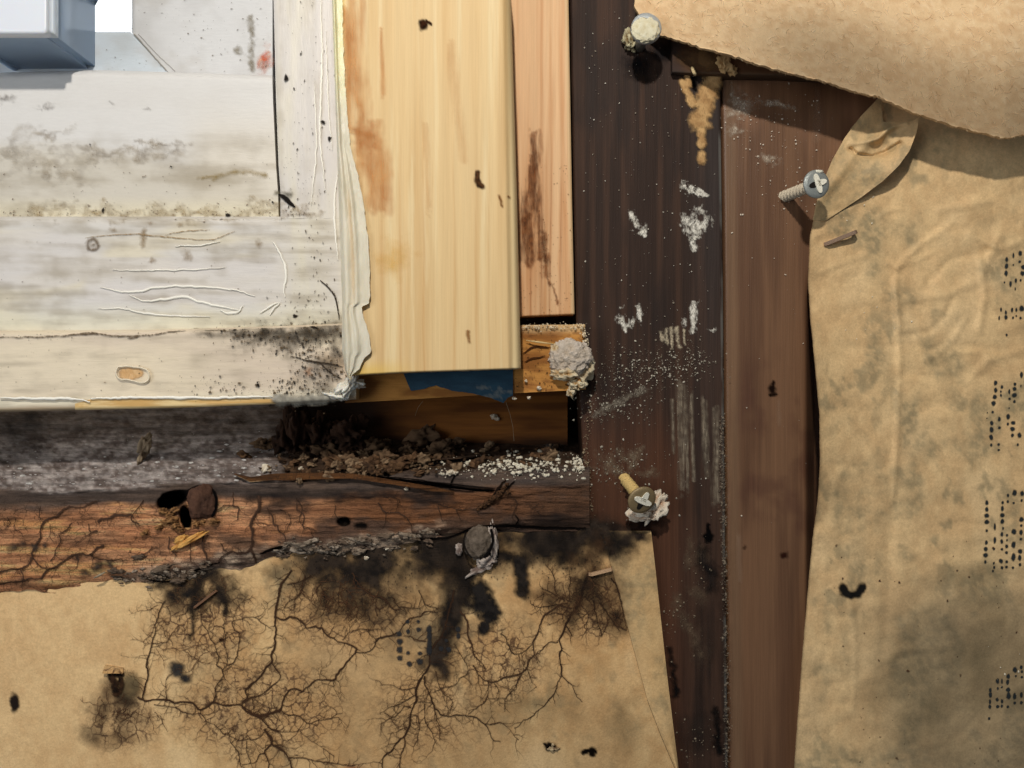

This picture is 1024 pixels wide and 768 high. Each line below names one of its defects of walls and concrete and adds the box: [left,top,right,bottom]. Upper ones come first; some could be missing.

crack [87,230,235,240]
leakage [191,219,347,406]
crack [260,546,288,554]
crack [145,562,220,583]
mould [155,568,246,640]
mould [281,513,652,680]
mould [171,662,190,682]